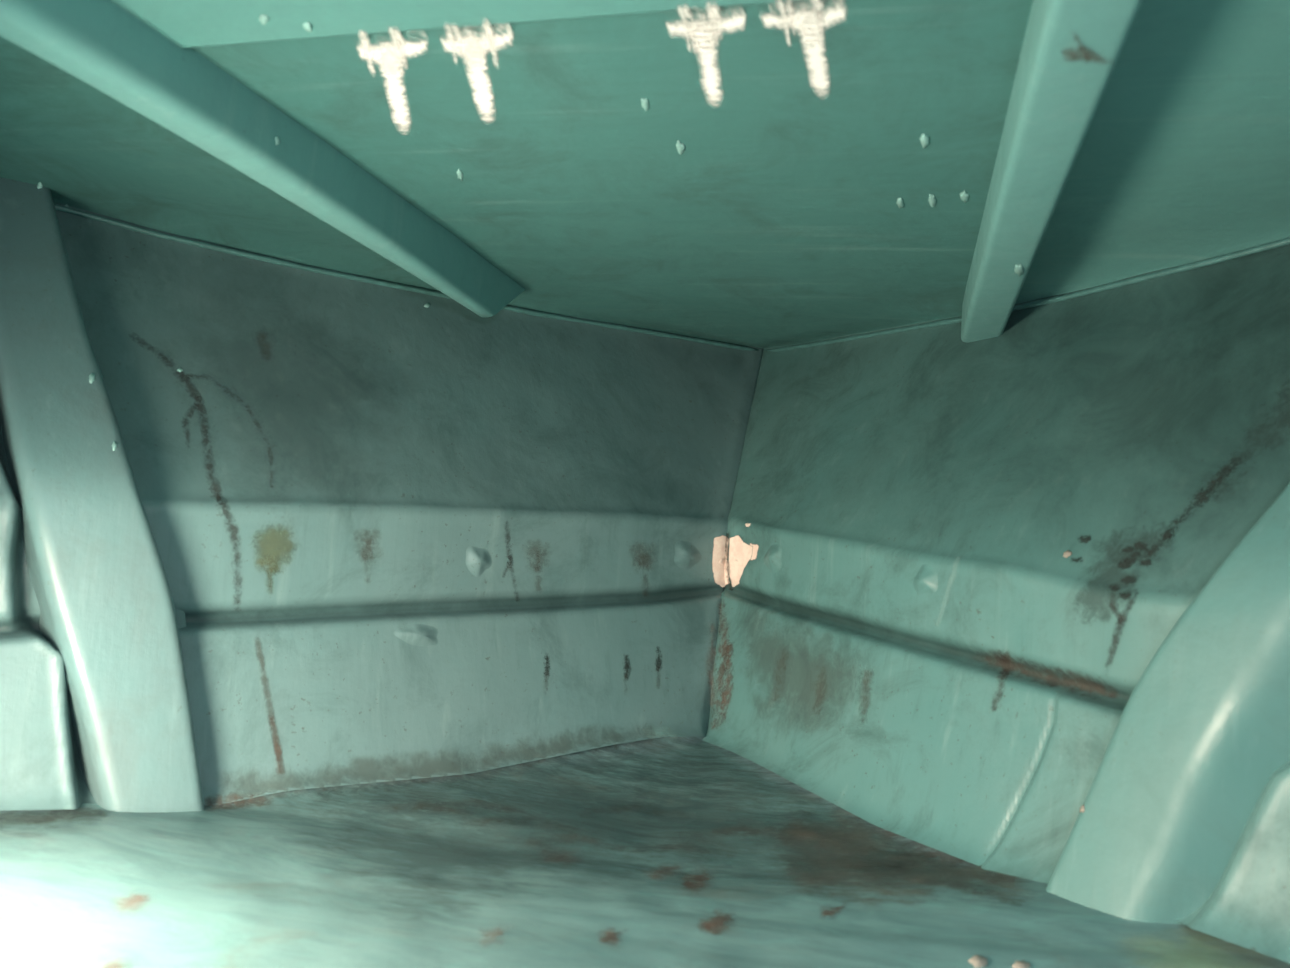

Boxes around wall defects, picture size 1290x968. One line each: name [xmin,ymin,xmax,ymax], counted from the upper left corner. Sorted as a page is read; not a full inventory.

damp [255,528,293,587]
spalling [712,523,759,588]
corrosion [713,605,732,728]
corrosion [987,654,1116,710]
corrosion [700,916,731,935]